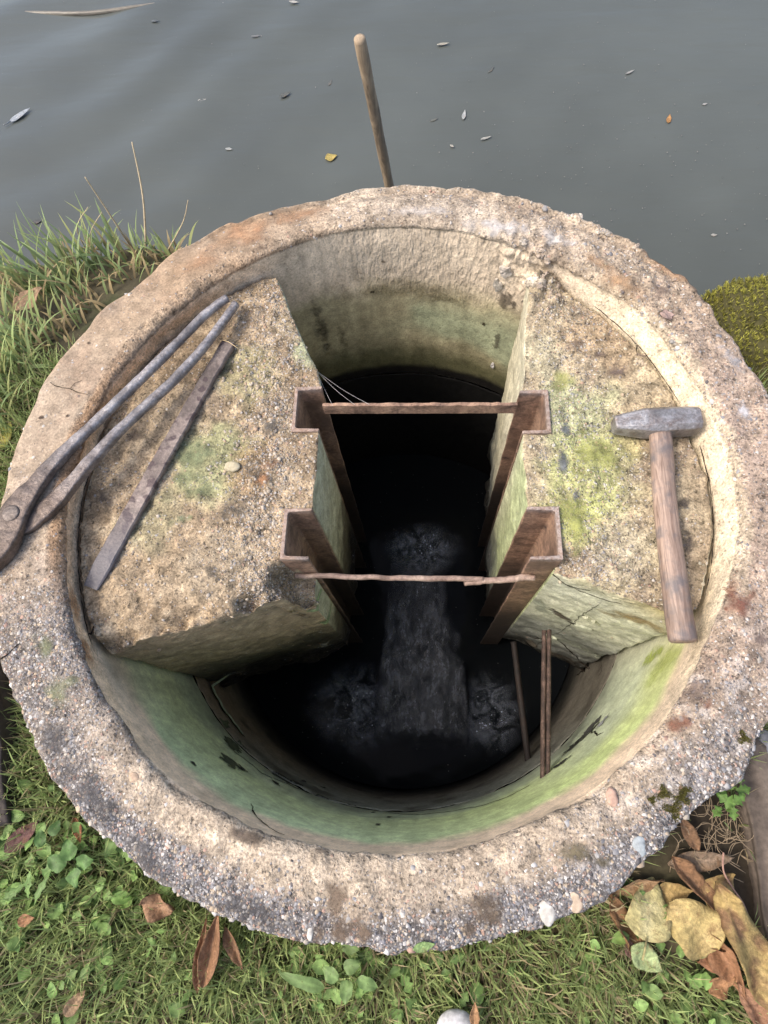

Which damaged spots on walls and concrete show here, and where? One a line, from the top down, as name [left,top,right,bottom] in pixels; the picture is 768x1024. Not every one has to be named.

crack [526,568,620,675]
rust [725,590,749,615]